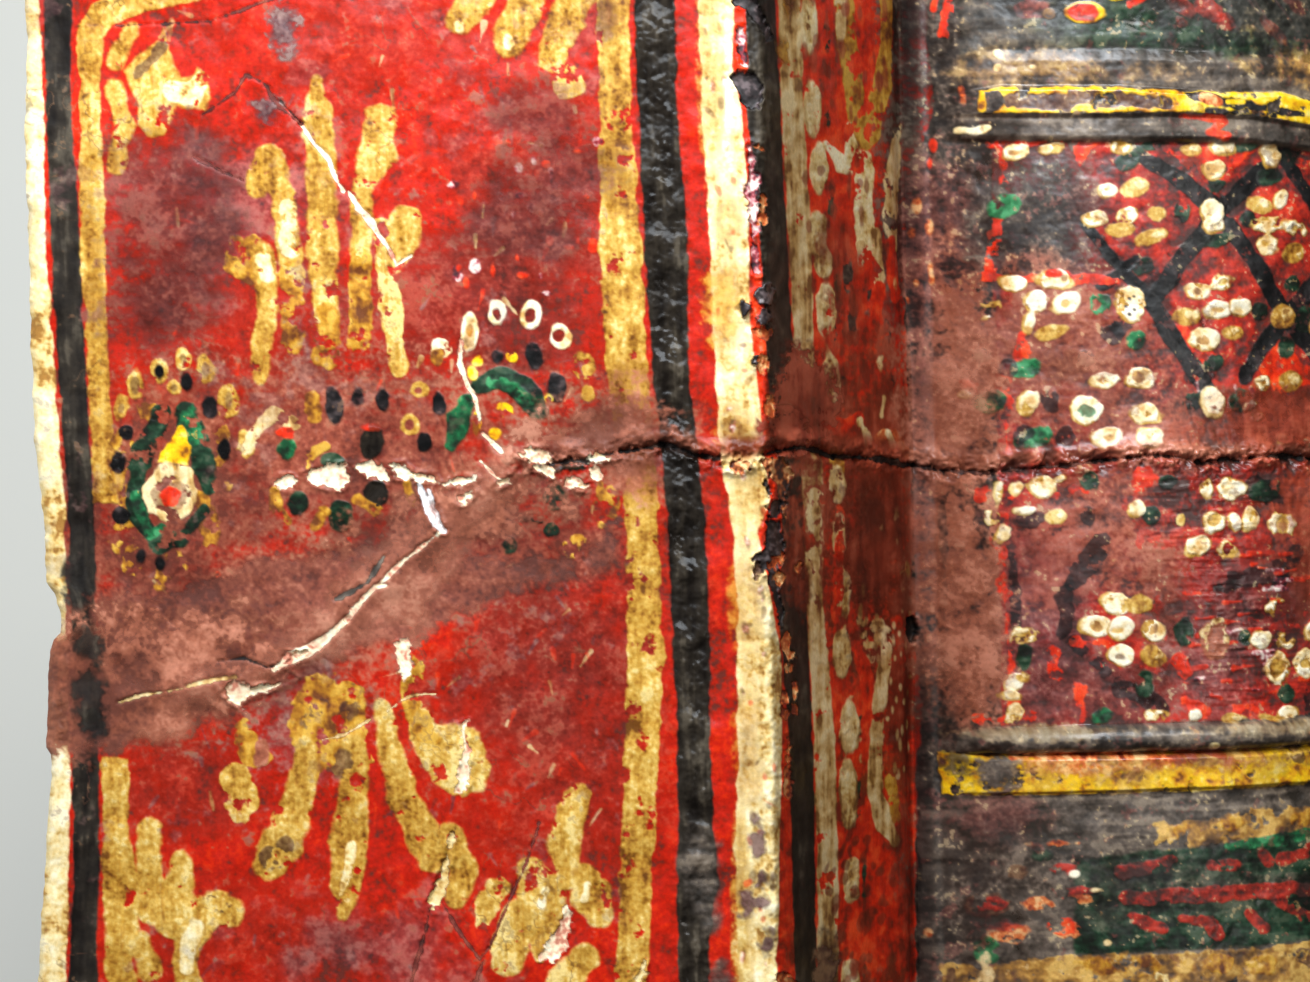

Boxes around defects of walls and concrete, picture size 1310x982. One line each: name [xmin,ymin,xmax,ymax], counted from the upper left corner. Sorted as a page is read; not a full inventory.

crack [115,0,273,27]
peeling [730,0,772,110]
crack [202,73,412,266]
peeling [739,144,776,375]
peeling [274,459,476,506]
crack [548,442,720,467]
crack [762,445,1310,476]
water stain [46,396,678,765]
peeling [394,638,414,680]
peeling [225,679,280,705]
peeling [455,720,472,794]
peeling [634,959,648,982]